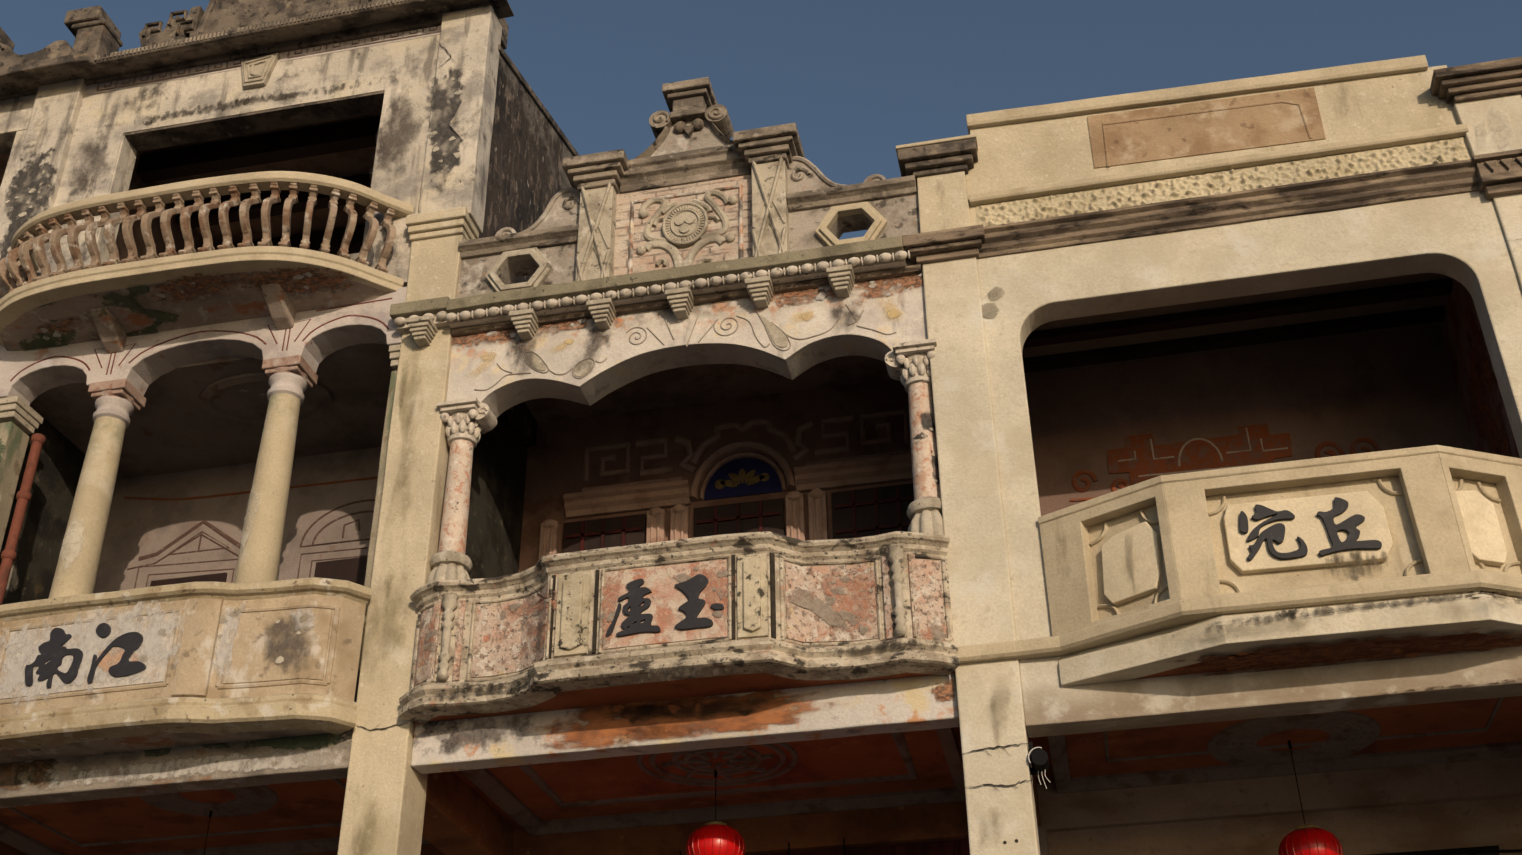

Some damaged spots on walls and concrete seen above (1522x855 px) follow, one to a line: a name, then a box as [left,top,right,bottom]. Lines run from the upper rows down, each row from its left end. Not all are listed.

damp [379,67,464,187]
damp [0,148,57,260]
peeling [19,318,81,351]
peeling [94,267,353,337]
peeling [789,568,878,634]
peeling [0,602,181,705]
corrosion [549,690,813,748]
crack [962,743,1031,791]